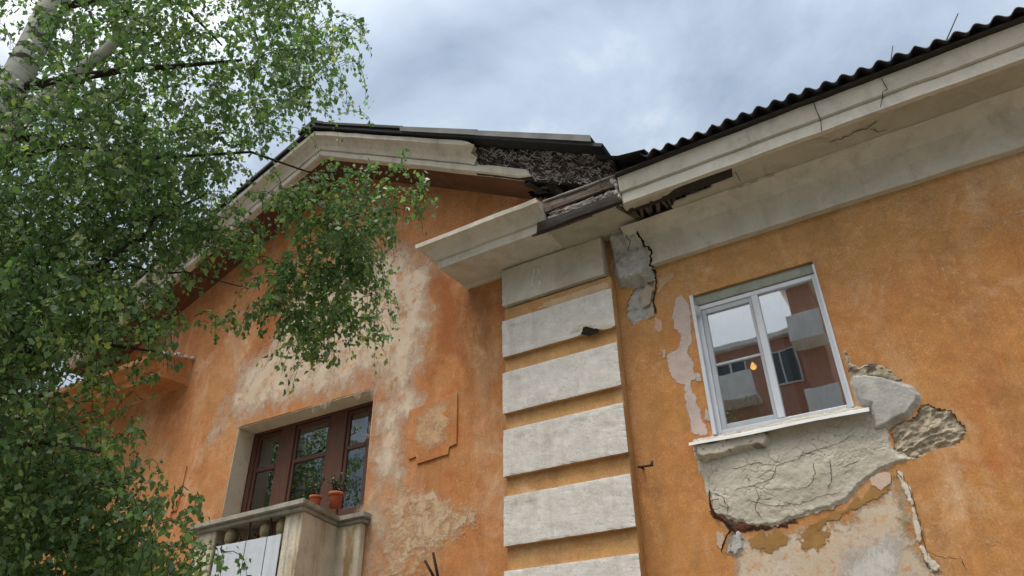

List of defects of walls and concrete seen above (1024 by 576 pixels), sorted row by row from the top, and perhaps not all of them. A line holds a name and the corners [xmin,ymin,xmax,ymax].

crack [814,78,888,143]
spalling [616,168,740,221]
crack [619,228,657,314]
flaking render [537,230,967,576]
crack [709,490,744,557]